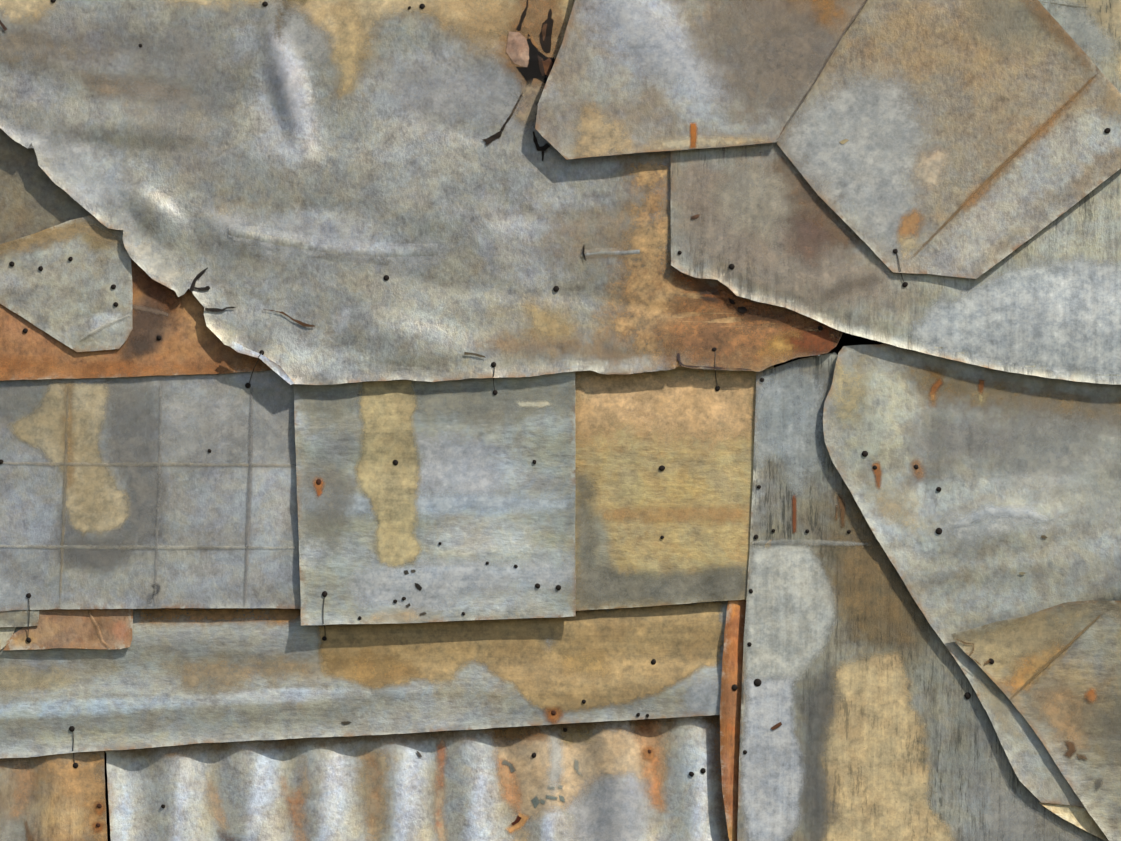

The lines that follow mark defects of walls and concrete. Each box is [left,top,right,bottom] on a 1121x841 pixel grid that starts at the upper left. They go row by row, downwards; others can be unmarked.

rust [138,271,180,310]
rust [0,359,160,380]
water stain [0,383,293,566]
water stain [179,380,835,841]
water stain [963,613,1079,655]
rust [166,742,231,756]
rust [260,709,677,841]
water stain [821,654,951,841]